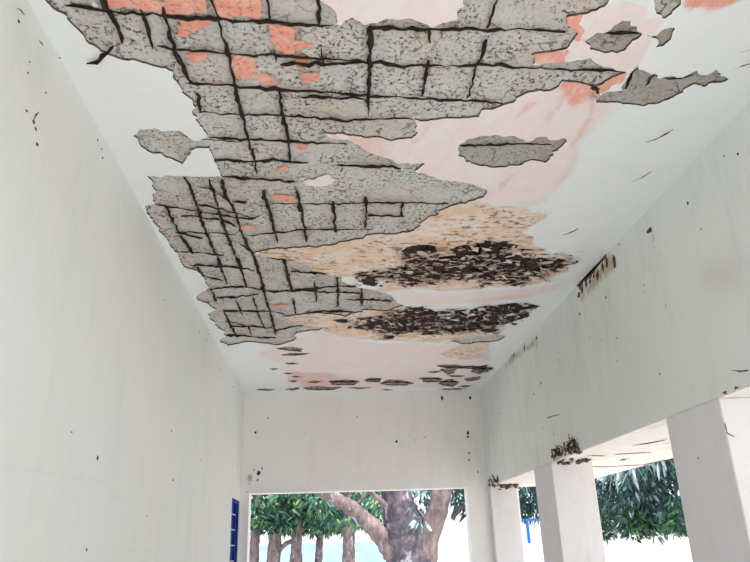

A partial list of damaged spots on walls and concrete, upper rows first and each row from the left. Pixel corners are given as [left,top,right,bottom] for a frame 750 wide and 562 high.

spalling [45,0,746,400]
damp [259,200,581,293]
damp [284,302,541,360]
spalling [551,434,591,465]
spalling [488,474,519,490]